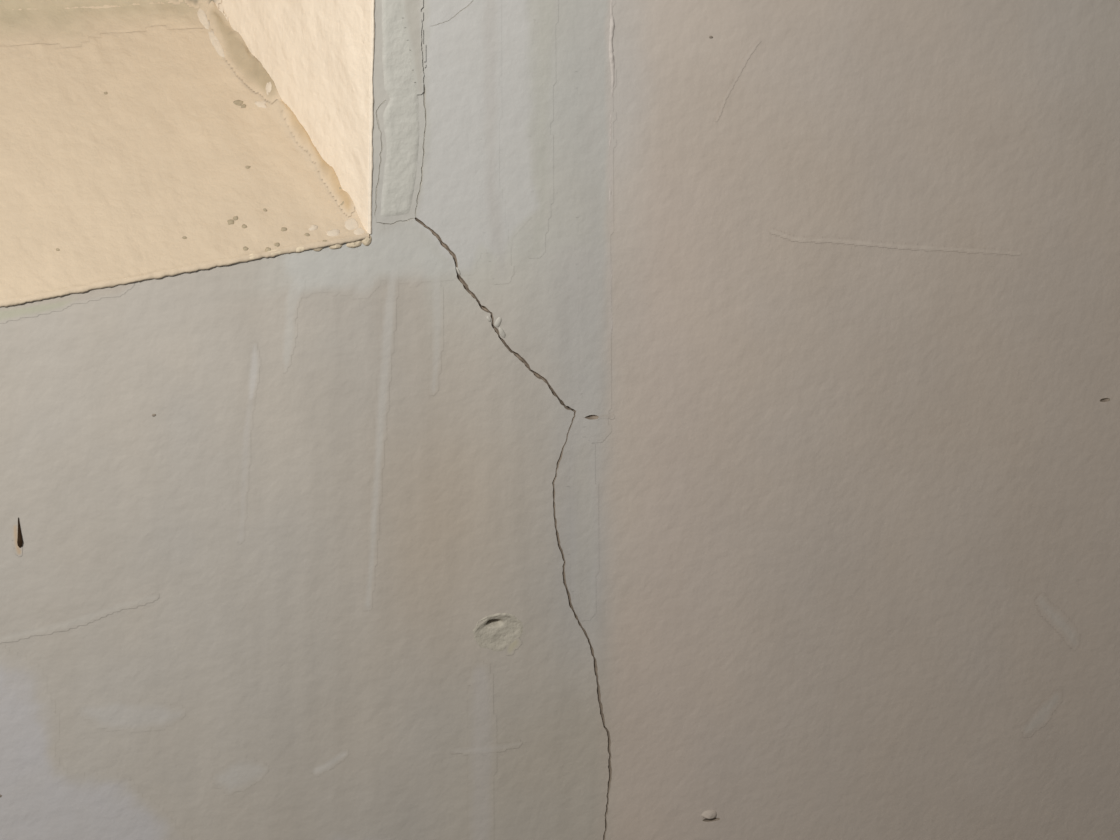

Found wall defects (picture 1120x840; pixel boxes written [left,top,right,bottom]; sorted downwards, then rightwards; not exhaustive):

crack [374,2,612,840]